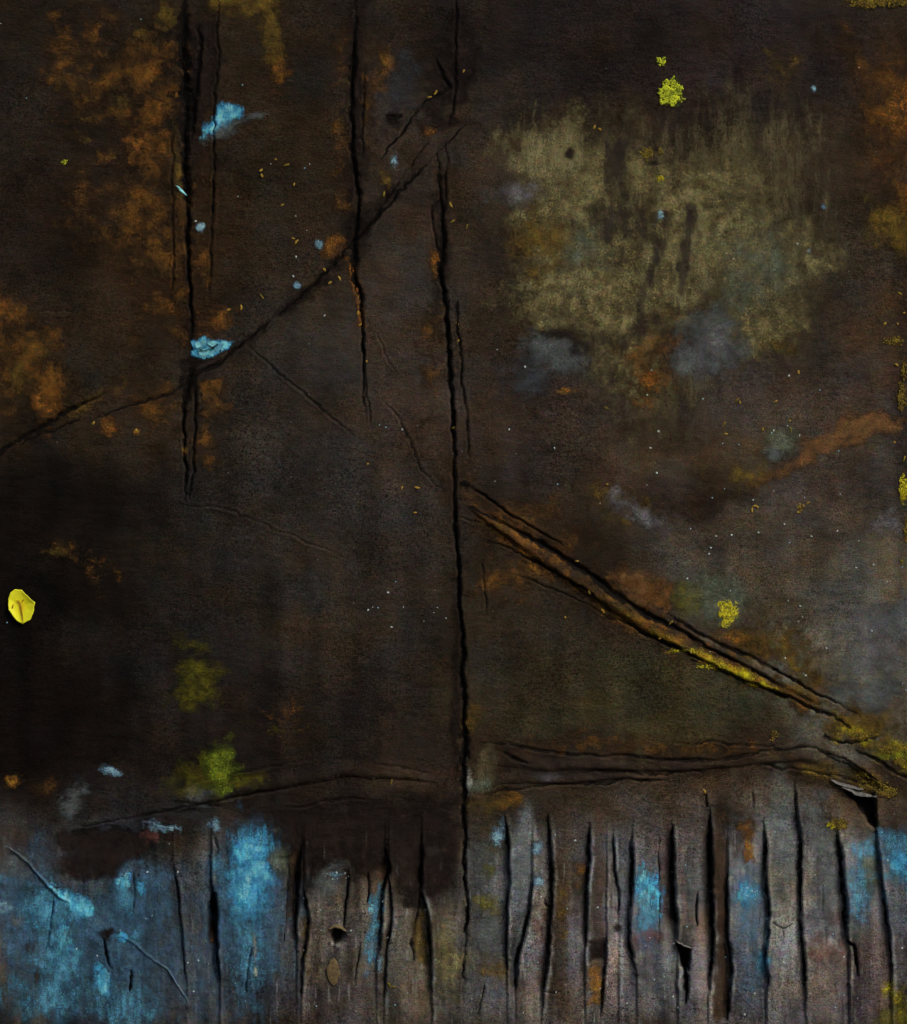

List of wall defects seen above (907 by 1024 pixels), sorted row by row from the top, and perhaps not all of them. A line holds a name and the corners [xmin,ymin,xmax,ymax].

rust [208,0,292,82]
rust [31,2,237,330]
crack [0,0,469,507]
damp [673,306,751,374]
rust [117,377,233,470]
rust [729,409,905,488]
crack [401,424,904,1016]
spalling [831,779,877,827]
damp [38,886,94,922]
damp [99,928,114,940]
crack [210,892,220,981]
crack [343,848,432,998]